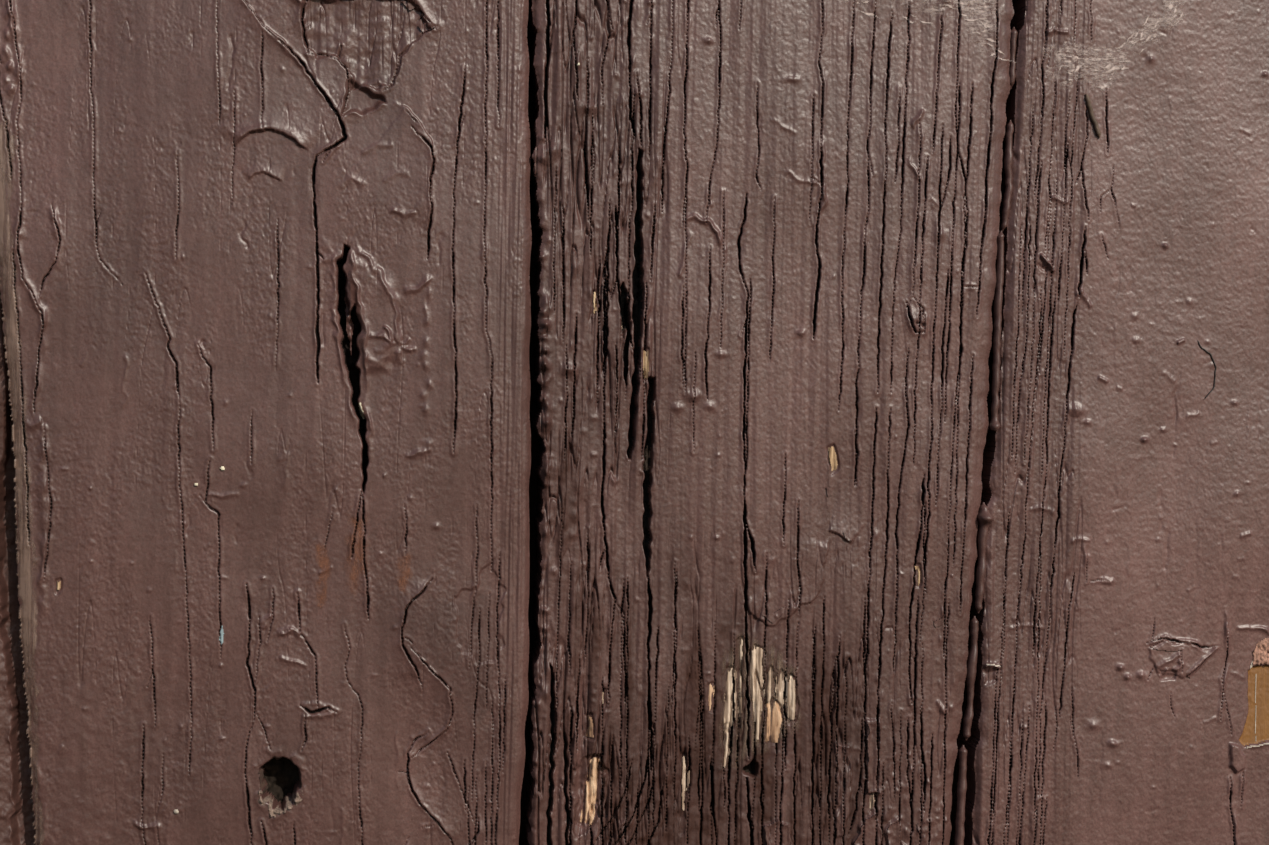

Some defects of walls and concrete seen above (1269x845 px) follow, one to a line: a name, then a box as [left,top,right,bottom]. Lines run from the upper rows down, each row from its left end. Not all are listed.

crack [219,1,349,378]
peeling [302,0,435,89]
crack [415,0,499,449]
crack [142,278,369,845]
crack [401,355,506,845]
peeling [580,757,603,826]
peeling [651,532,853,768]
peeling [1239,638,1269,749]